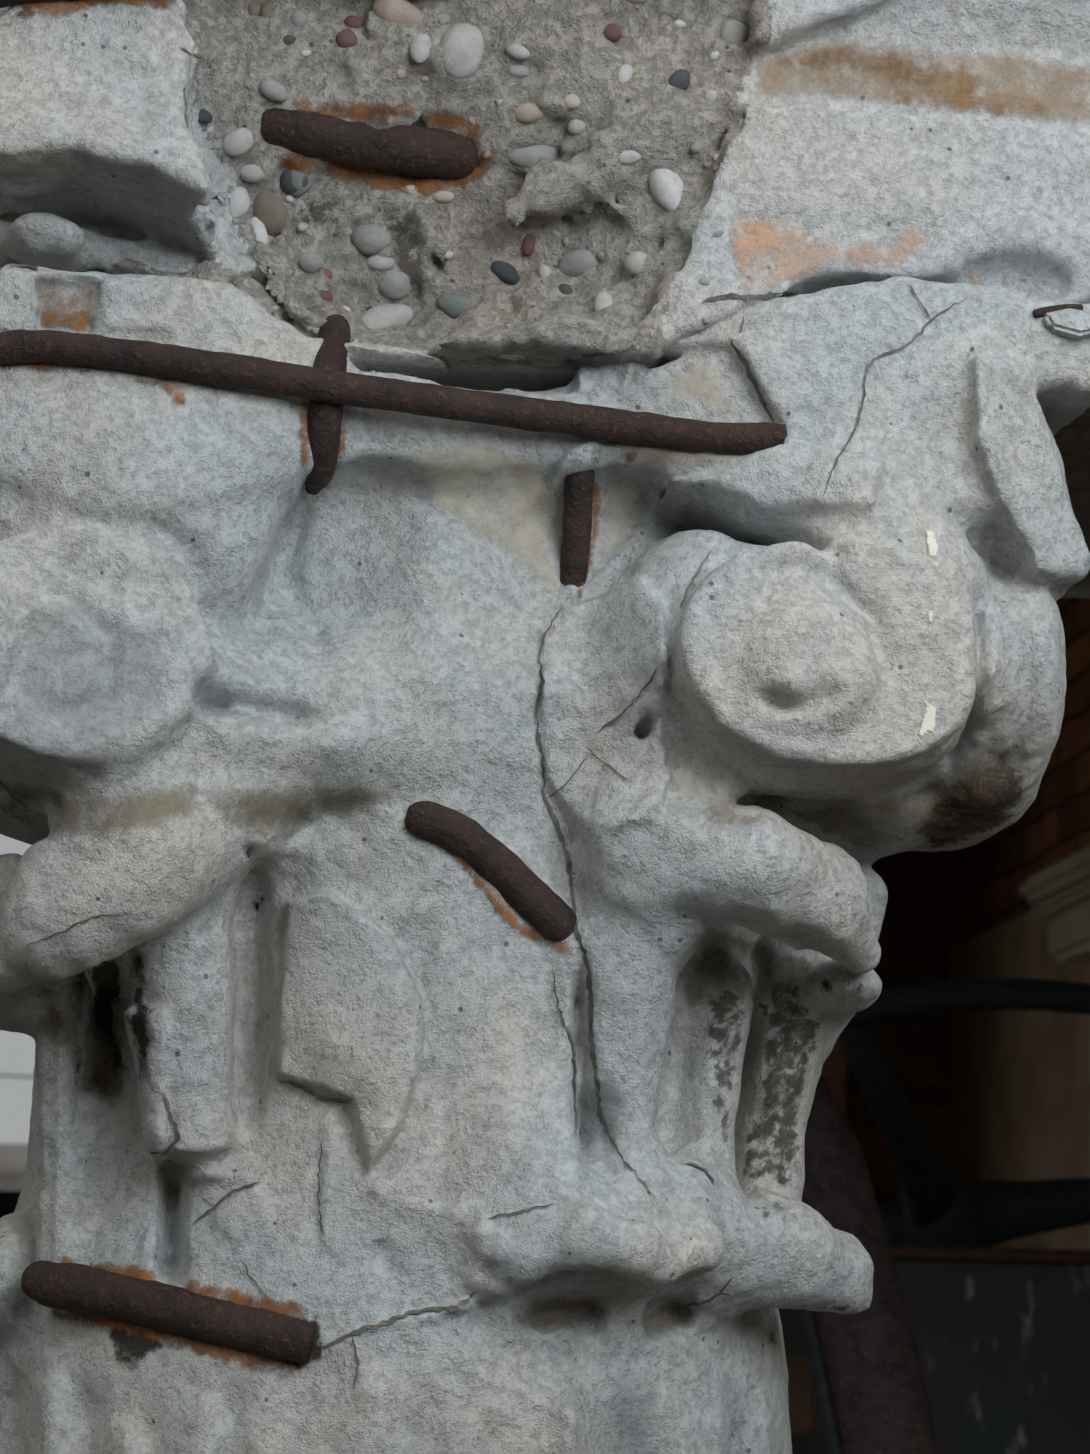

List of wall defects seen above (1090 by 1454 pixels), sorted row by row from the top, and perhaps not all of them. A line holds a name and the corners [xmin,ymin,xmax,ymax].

rust [3,0,169,25]
rust [280,100,493,195]
spalling [0,0,787,495]
crack [823,284,968,496]
crack [680,550,711,607]
rust [434,843,570,952]
crack [535,605,661,1198]
crack [490,1204,553,1219]
rust [63,1256,153,1280]
rust [53,1311,293,1372]
rust [186,1279,301,1317]
crack [316,1291,477,1391]